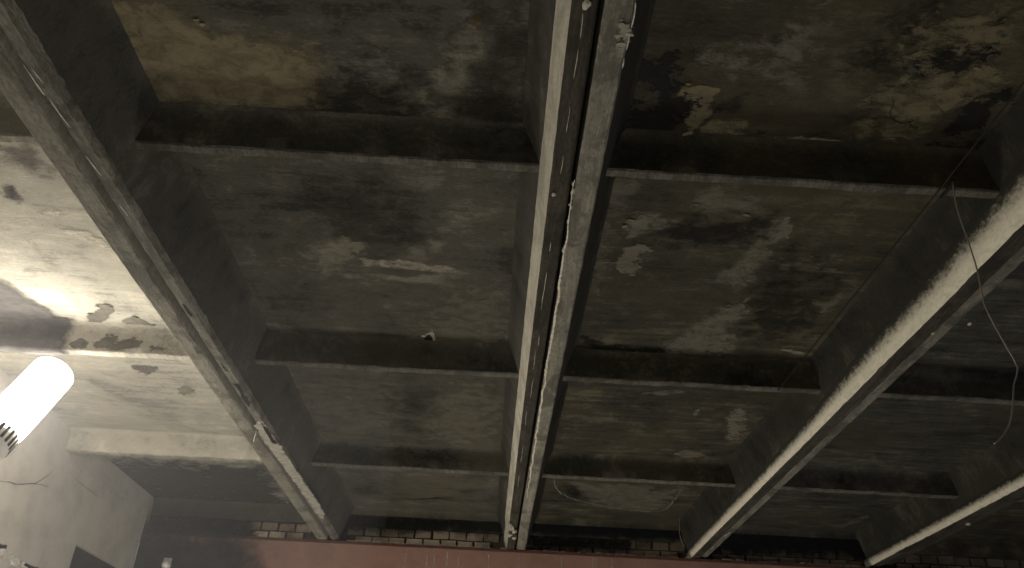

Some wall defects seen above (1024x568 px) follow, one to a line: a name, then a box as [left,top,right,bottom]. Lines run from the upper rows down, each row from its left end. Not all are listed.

spalling [614,20,634,49]
peeling [672,82,748,136]
water stain [343,258,467,283]
peeling [69,304,172,352]
peeling [132,365,159,375]